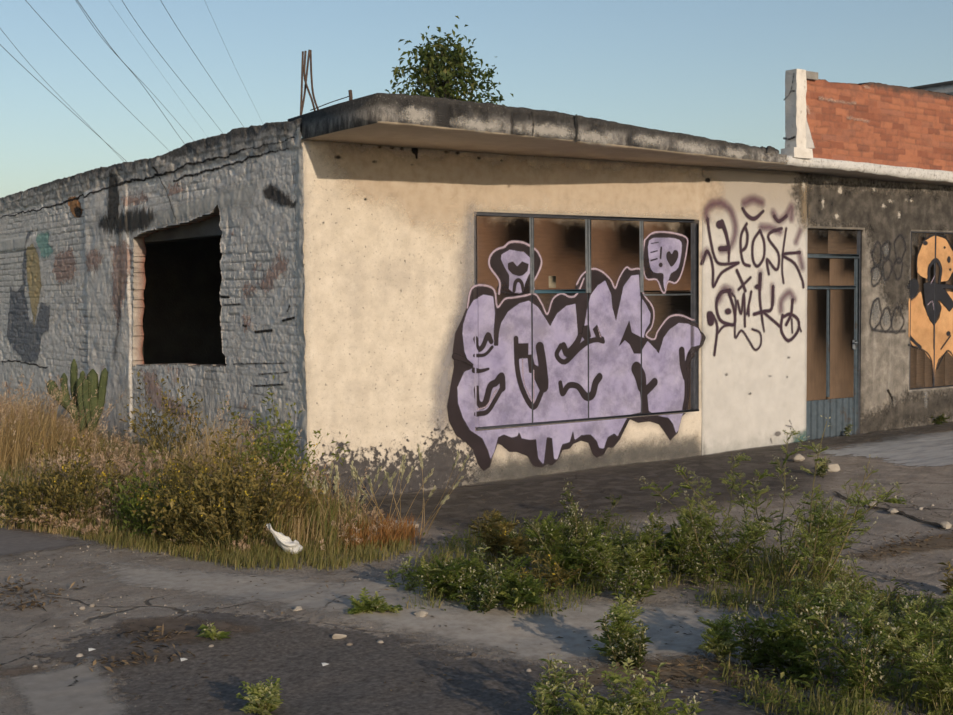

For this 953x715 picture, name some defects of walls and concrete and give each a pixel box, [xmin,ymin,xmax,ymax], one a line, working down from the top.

leakage [435,101,469,127]
leakage [538,116,573,139]
leakage [312,217,700,503]